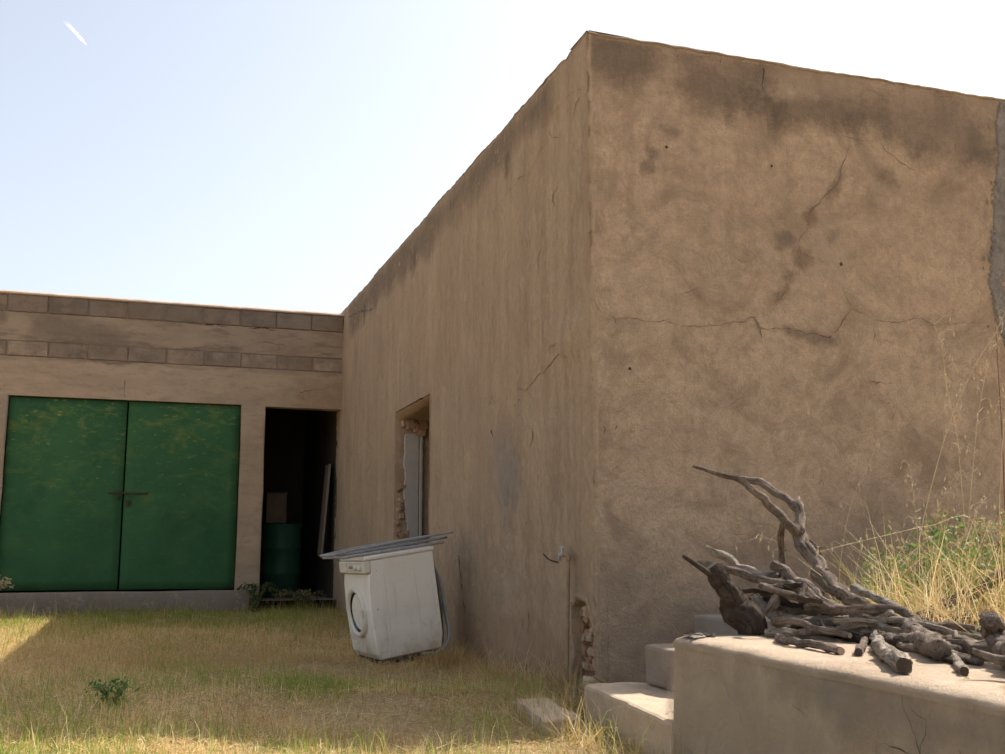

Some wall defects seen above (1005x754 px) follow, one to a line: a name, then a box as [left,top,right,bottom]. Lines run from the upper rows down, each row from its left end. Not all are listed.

crack [589,103,1005,346]
spalling [569,592,610,692]
crack [876,706,926,754]